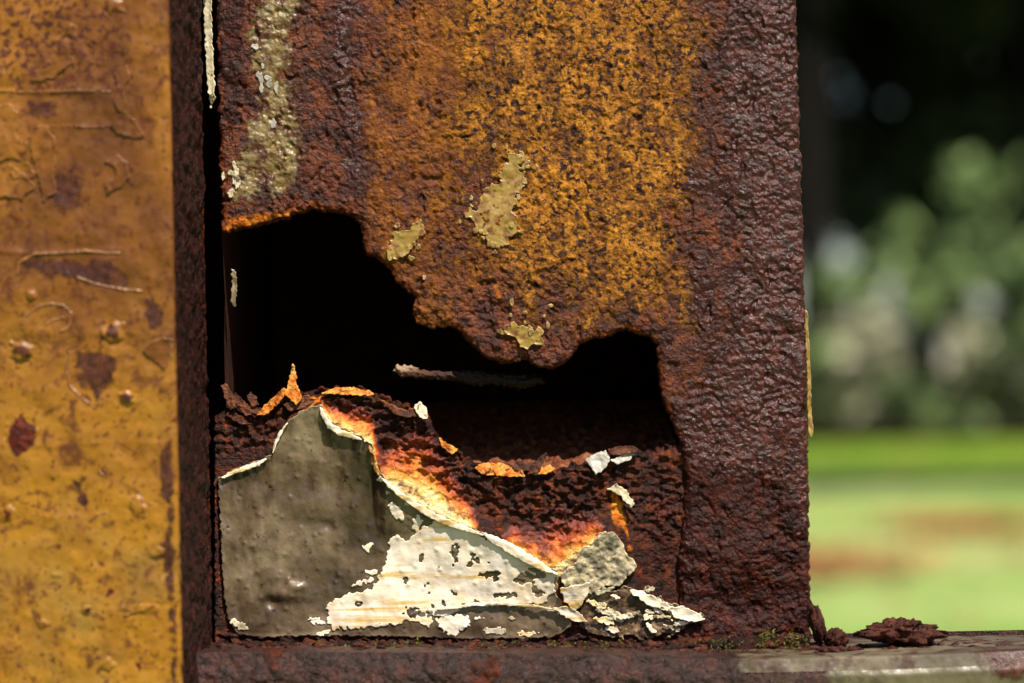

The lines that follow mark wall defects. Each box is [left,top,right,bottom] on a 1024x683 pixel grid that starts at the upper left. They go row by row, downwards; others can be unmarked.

peeling [203,0,216,109]
peeling [221,0,303,202]
peeling [387,219,426,261]
peeling [458,143,538,254]
rust [76,351,116,400]
peeling [497,299,553,350]
rust [213,0,864,683]
rust [8,415,36,456]
peeling [217,405,705,641]